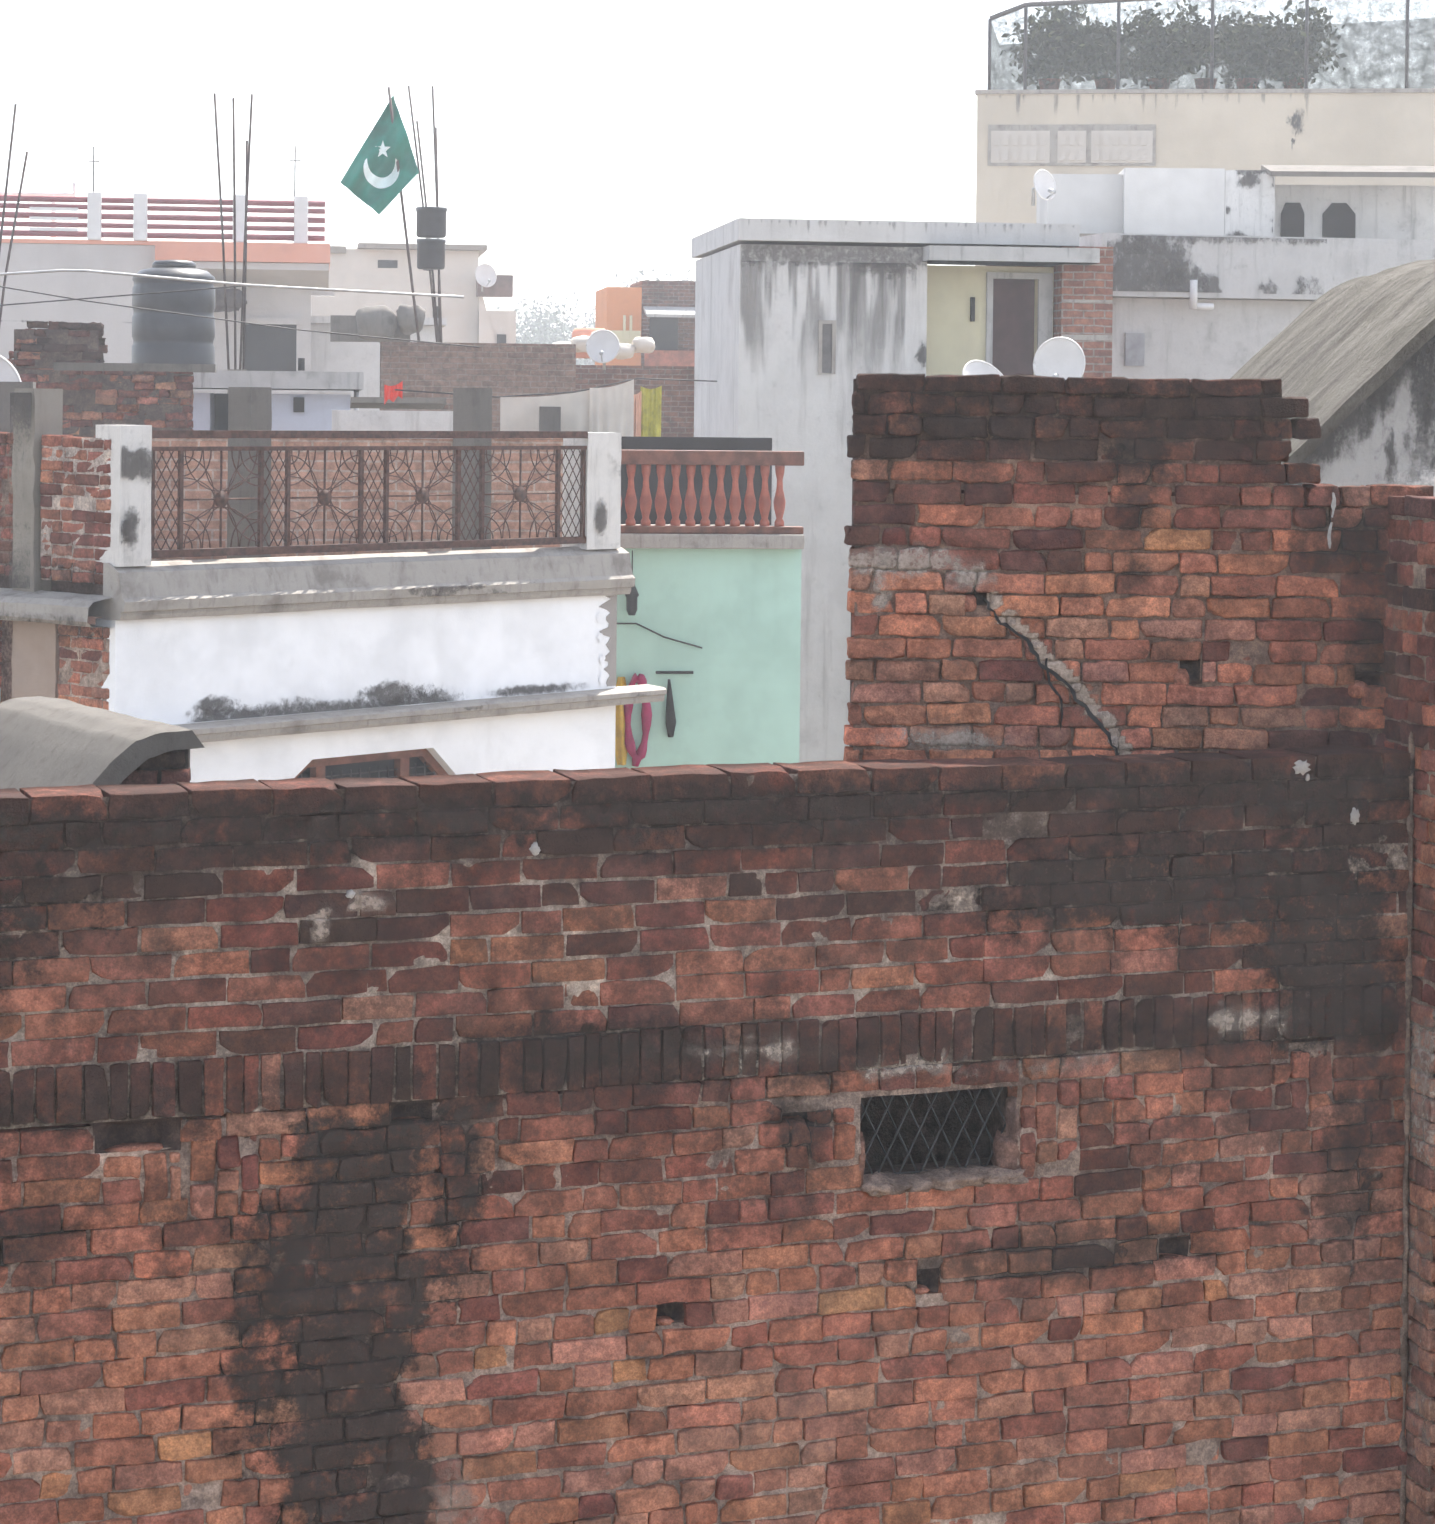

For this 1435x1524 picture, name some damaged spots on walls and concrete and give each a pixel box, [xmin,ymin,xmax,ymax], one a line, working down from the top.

mould [917,344,927,367]
crack [984,591,1133,755]